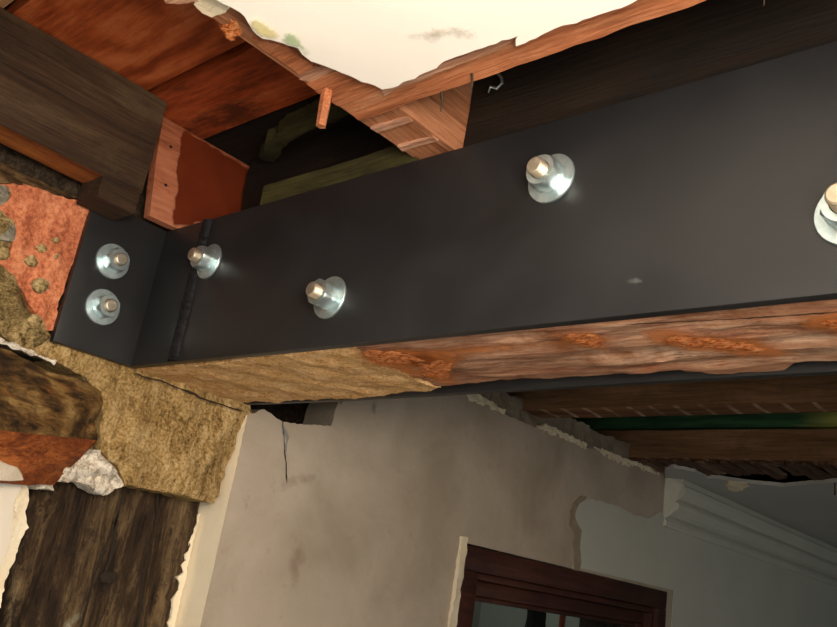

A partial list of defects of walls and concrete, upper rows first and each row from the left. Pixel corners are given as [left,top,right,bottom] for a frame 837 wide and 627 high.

flaking render [0,183,89,331]
peeling [363,349,454,380]
crack [281,419,289,483]
spalling [467,393,660,475]
peeling [725,480,749,492]